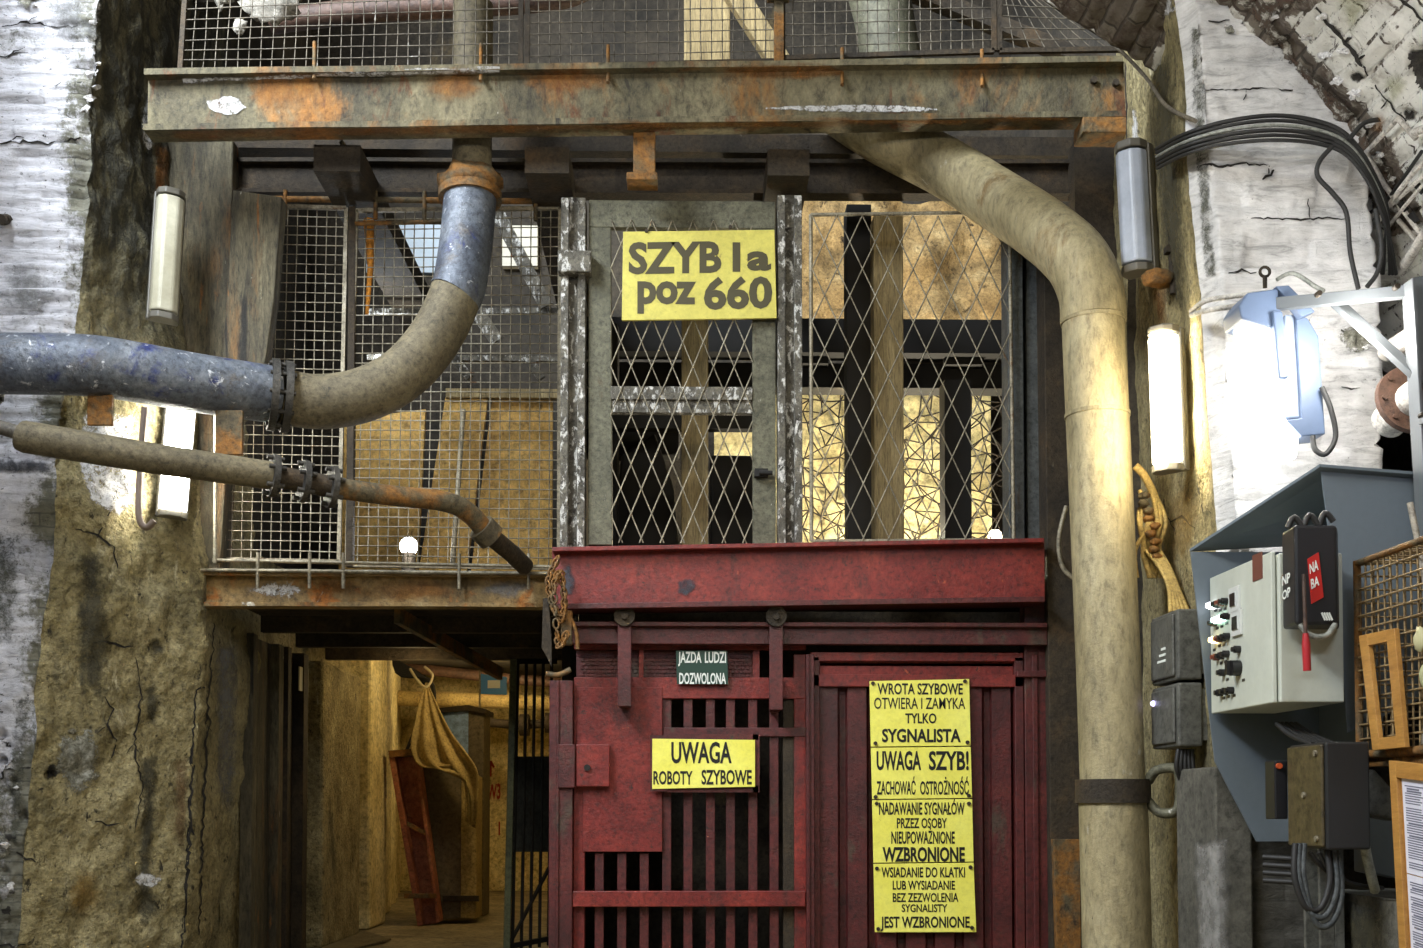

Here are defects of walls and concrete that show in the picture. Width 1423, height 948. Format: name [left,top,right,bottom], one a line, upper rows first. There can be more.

corrosion [730,65,841,78]
spalling [1408,52,1423,90]
crack [0,136,81,145]
corrosion [157,128,469,186]
corrosion [486,122,670,132]
leakage [0,534,18,639]
crack [180,623,215,948]
spalling [0,771,19,914]